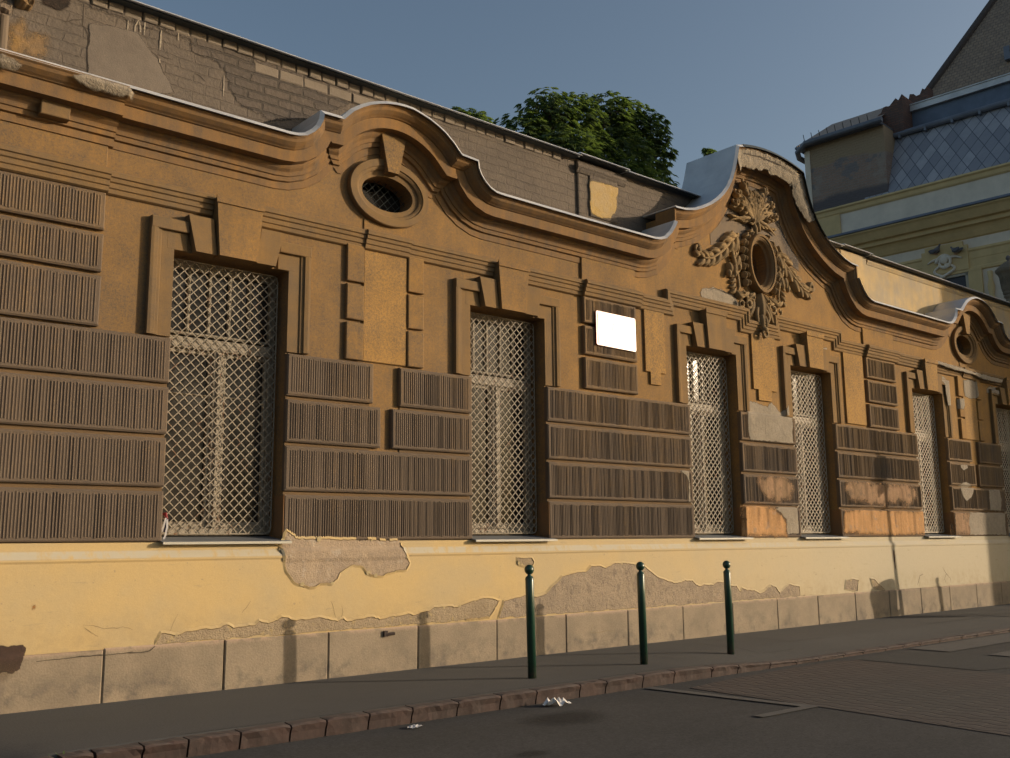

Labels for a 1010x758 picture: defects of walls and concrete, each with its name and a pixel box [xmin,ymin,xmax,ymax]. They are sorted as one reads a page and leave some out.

flaking render [44,0,350,122]
peeling [741,475,793,537]
peeling [844,480,925,536]
spalling [279,529,411,590]
spalling [154,561,801,645]